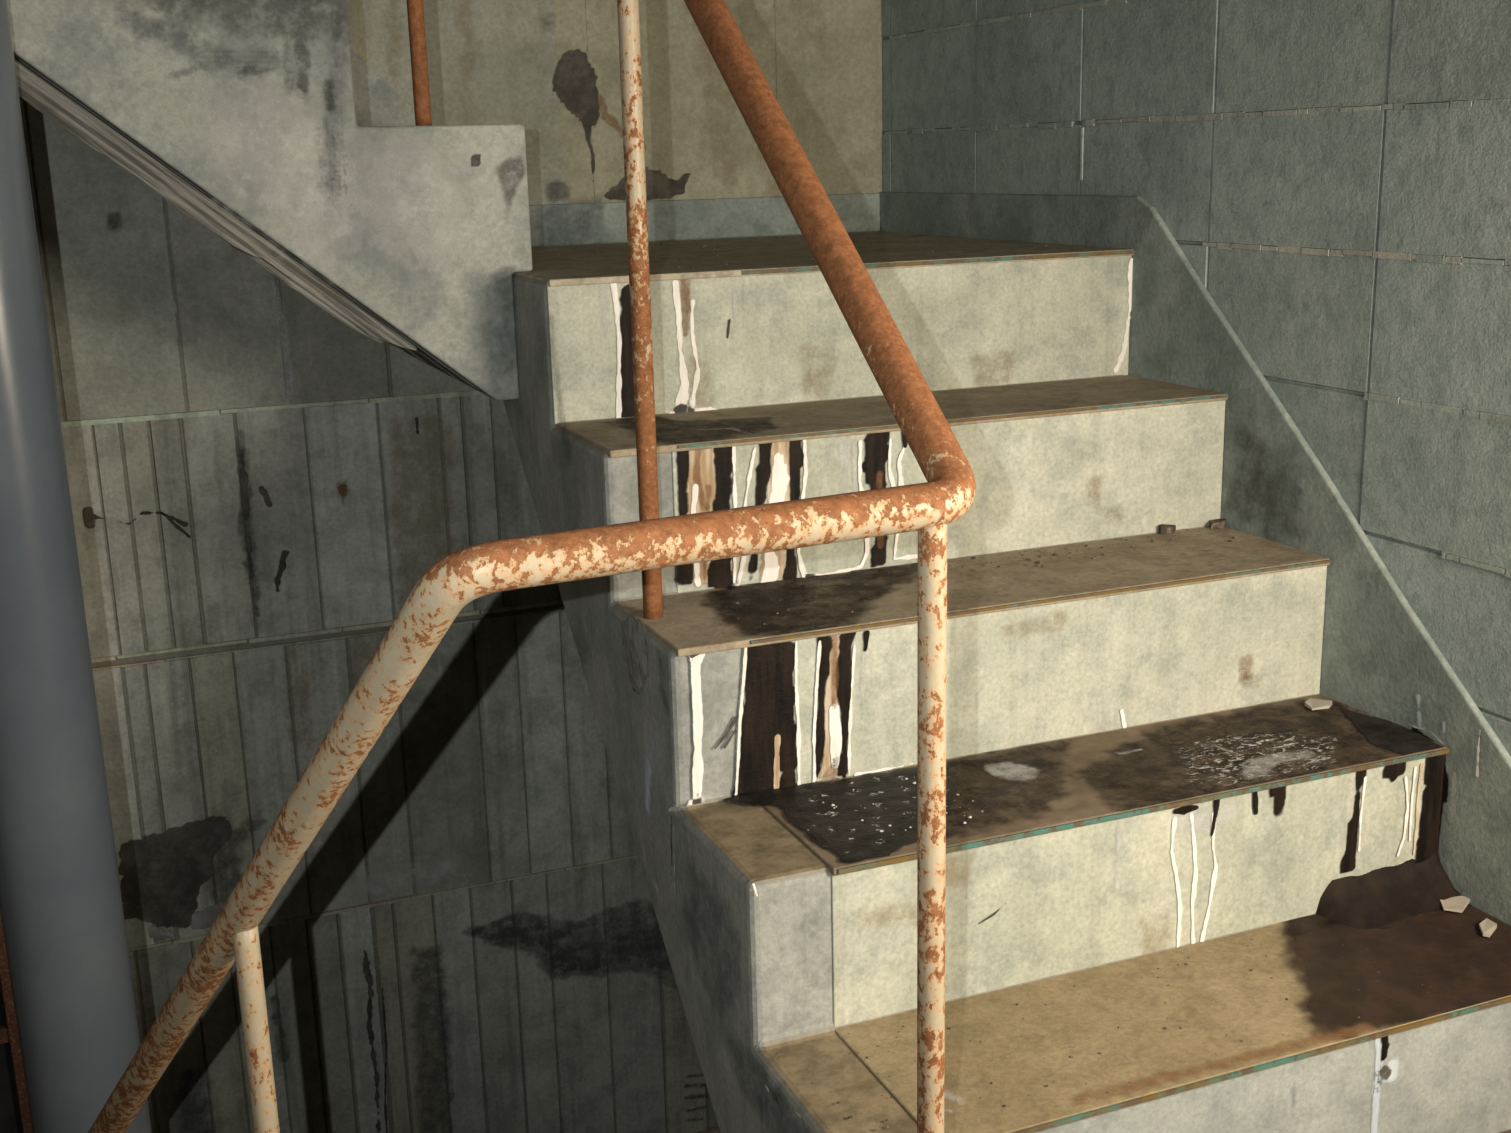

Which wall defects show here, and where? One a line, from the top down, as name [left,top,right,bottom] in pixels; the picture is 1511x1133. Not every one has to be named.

leakage [655,279,808,515]
leakage [840,432,907,492]
leakage [676,533,918,863]
leakage [946,694,1456,948]
leakage [1284,906,1511,1133]